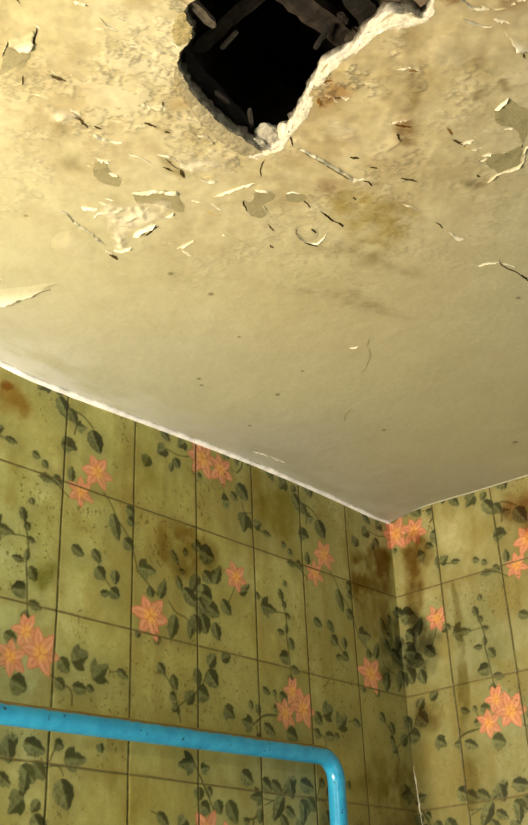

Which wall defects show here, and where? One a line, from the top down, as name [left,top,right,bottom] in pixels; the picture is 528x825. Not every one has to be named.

peeling [461,0,528,59]
flaking render [170,0,436,174]
peeling [447,98,528,183]
peeling [157,154,216,184]
crack [436,222,464,241]
crack [479,262,528,281]
peeling [0,279,59,308]